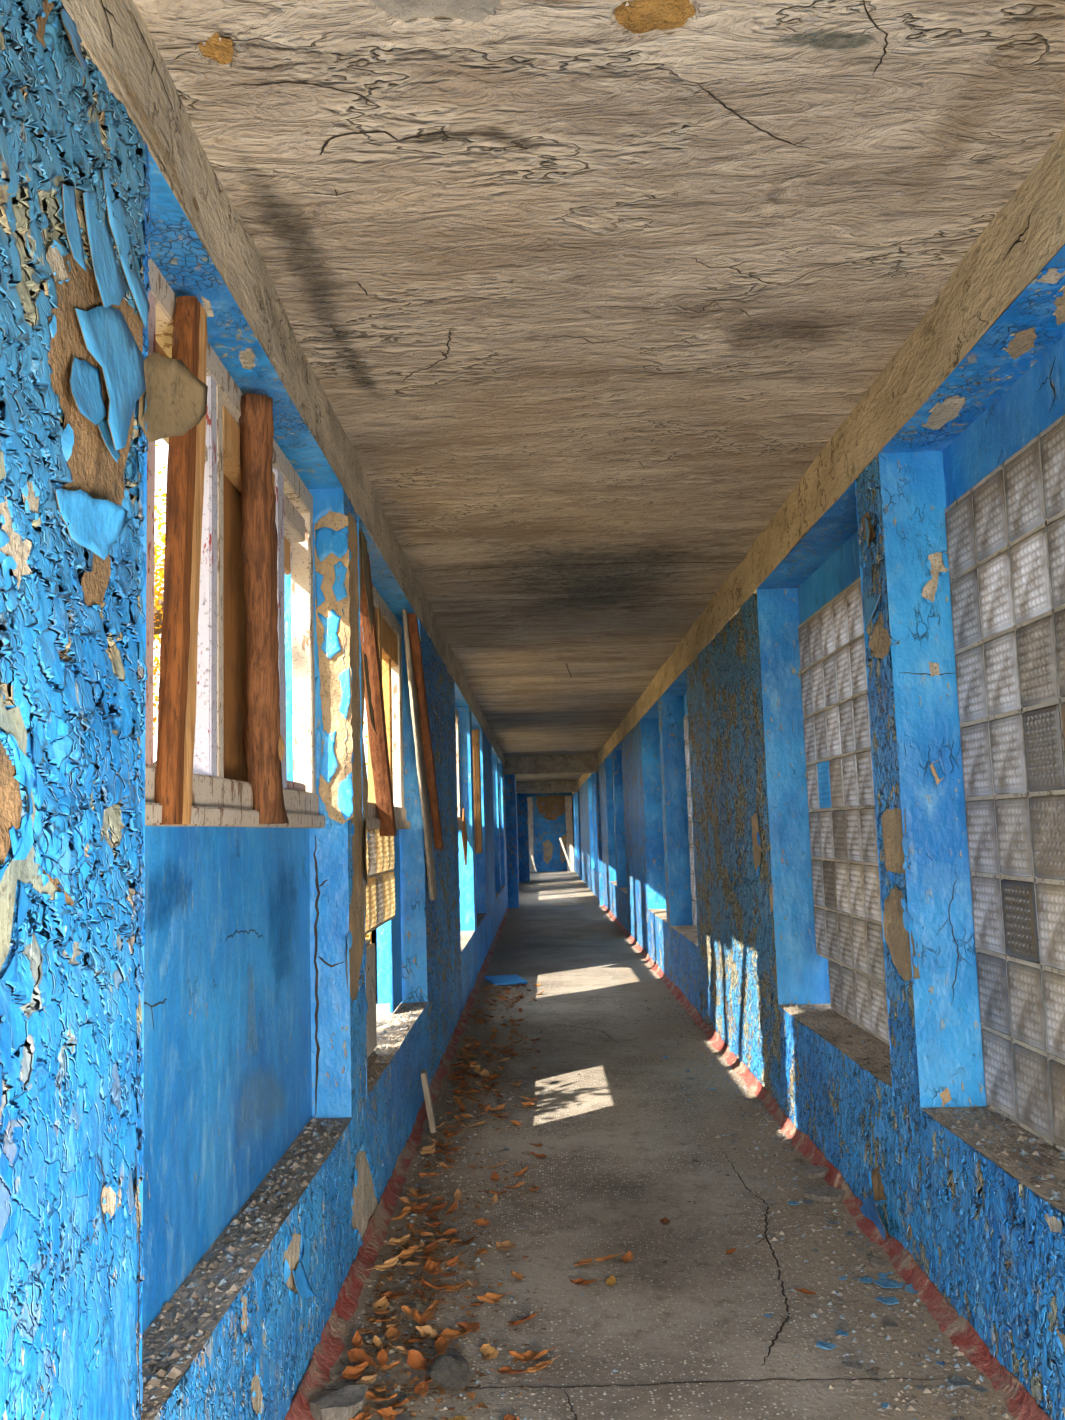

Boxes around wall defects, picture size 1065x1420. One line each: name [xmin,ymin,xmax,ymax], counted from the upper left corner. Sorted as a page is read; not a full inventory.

crack [101,0,174,112]
flaking render [615,0,696,38]
crack [863,0,889,76]
crack [231,81,450,201]
crack [696,82,811,149]
flaking render [1004,268,1065,359]
peeling [0,168,208,611]
flaking render [922,395,972,430]
peeling [314,511,378,1007]
peeling [0,691,77,982]
peeling [101,1183,119,1223]
crack [324,1149,950,1420]